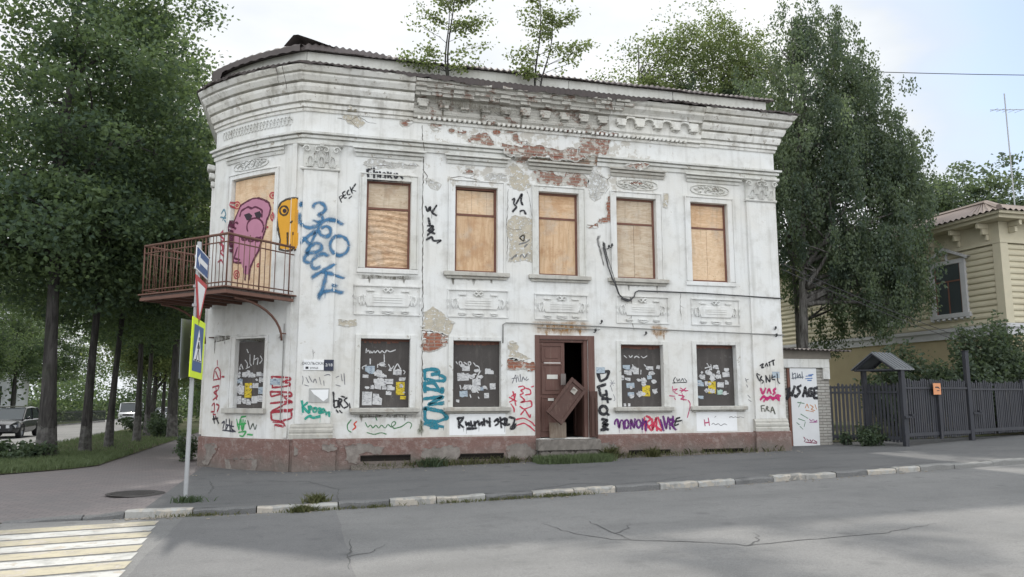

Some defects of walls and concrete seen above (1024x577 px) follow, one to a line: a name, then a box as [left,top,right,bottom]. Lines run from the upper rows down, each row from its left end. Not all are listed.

flaking render [429,117,619,229]
peeling [506,215,532,263]
peeling [420,306,455,353]
flaking render [507,340,535,372]
peeling [321,442,384,465]